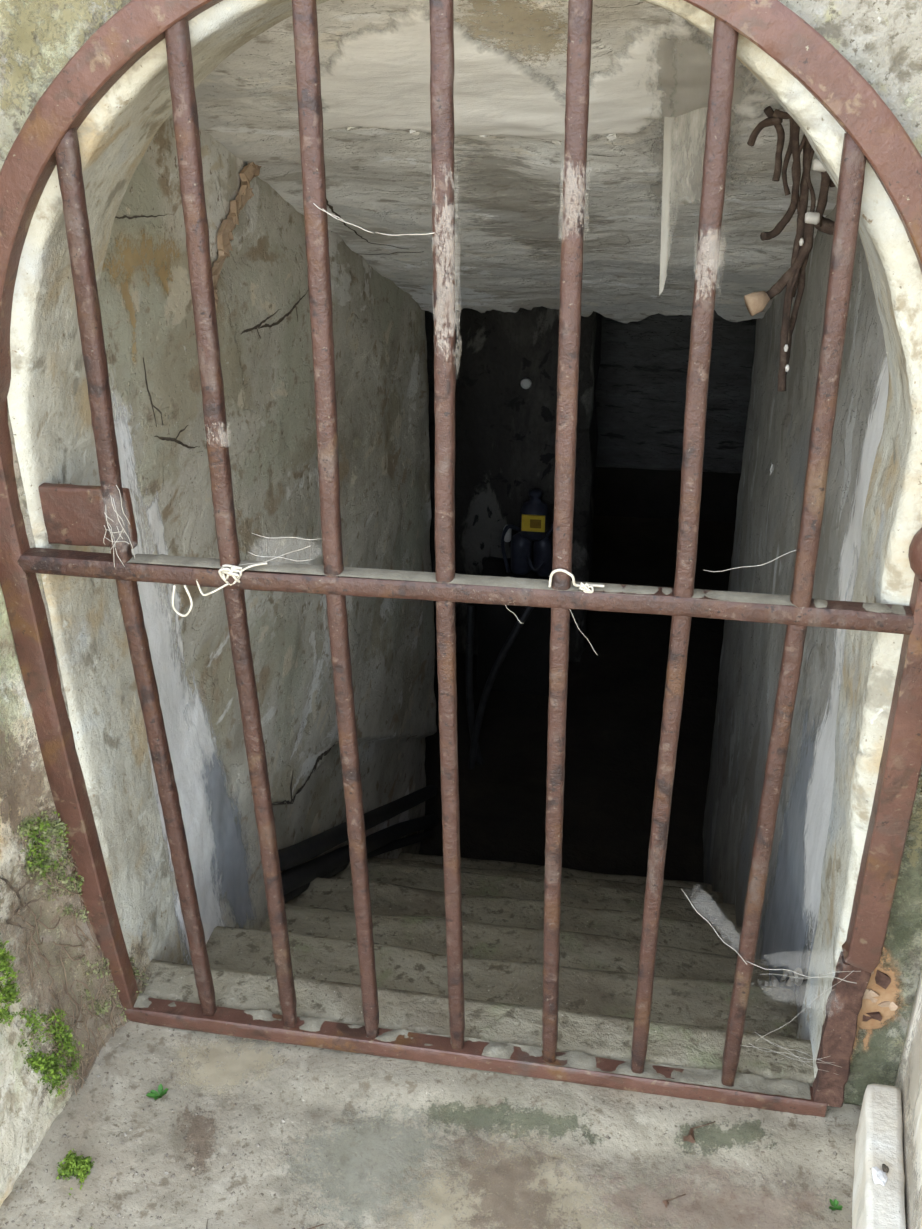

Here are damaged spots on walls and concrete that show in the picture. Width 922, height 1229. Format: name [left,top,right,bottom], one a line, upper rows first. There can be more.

crack [115,212,174,220]
crack [241,290,308,338]
crack [143,357,200,448]
corrosion [850,947,901,1061]